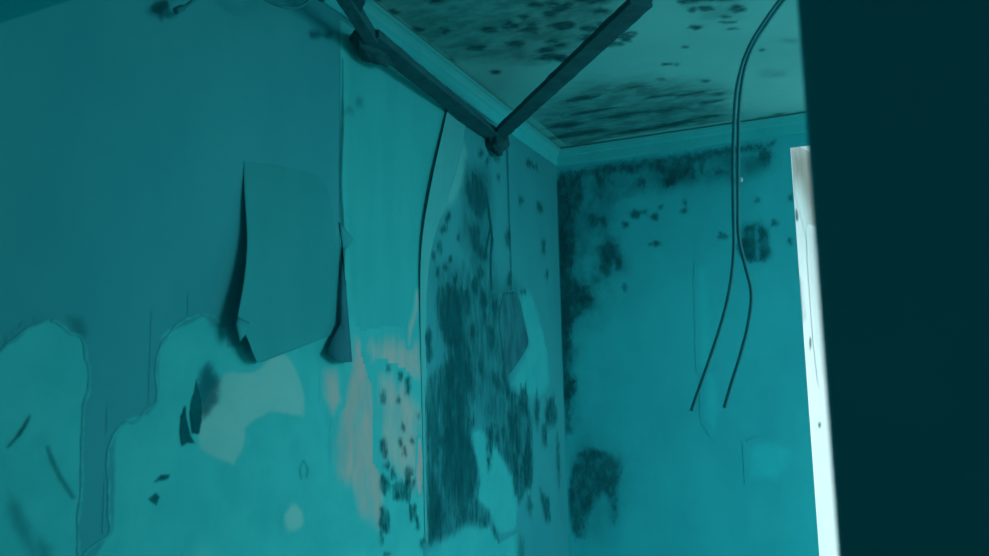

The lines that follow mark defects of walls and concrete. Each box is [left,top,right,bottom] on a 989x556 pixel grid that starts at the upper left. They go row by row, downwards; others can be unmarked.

leakage [483,0,606,46]
leakage [552,110,645,145]
leakage [595,146,771,185]
leakage [322,121,591,556]
spalling [180,367,218,446]
leakage [569,450,618,534]